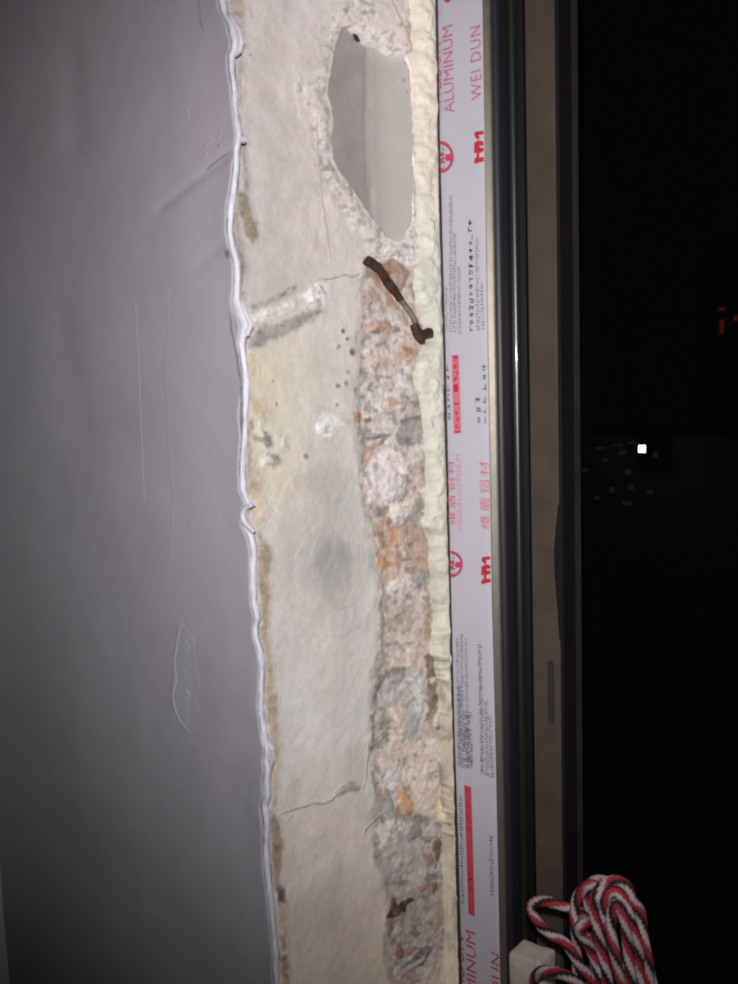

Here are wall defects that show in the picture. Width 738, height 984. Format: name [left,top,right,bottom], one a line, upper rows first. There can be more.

rust [361,258,400,312]
flaking render [293,0,447,984]
crack [277,735,371,823]